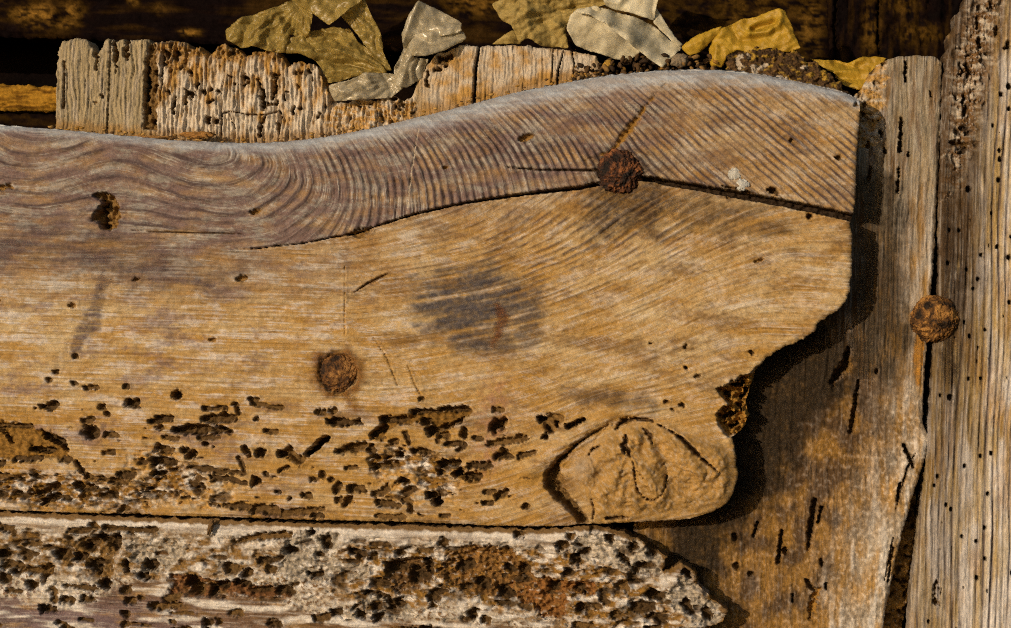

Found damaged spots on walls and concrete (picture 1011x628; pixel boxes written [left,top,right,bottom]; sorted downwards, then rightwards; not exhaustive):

crack [131,167,600,250]
rust [589,182,667,234]
crack [639,176,853,222]
rust [313,349,362,409]